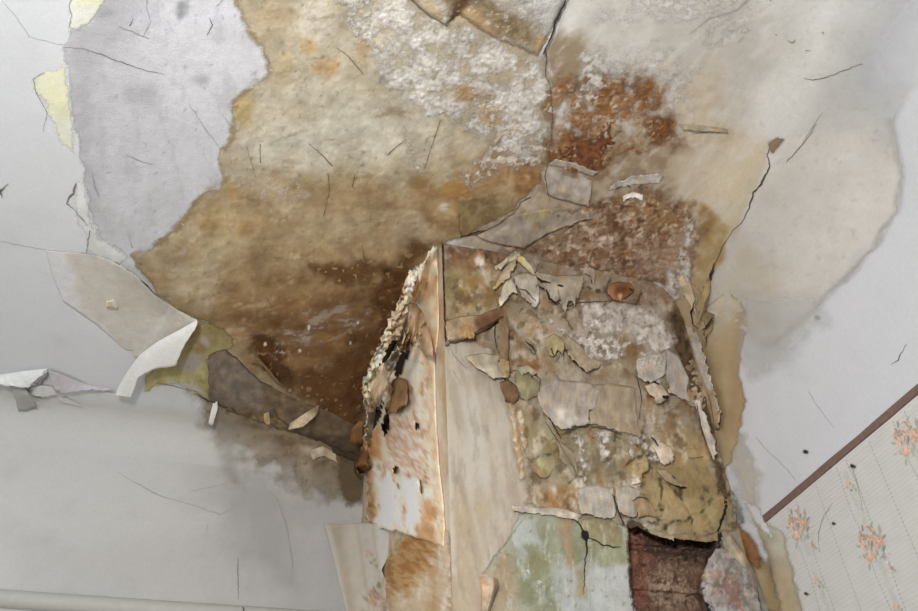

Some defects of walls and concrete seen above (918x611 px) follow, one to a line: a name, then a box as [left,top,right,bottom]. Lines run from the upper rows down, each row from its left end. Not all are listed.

crack [543,0,566,153]
corrosion [542,45,682,174]
peeling [0,0,269,411]
water stain [130,0,902,536]
peeling [459,159,641,313]
peeling [608,174,664,202]
flaking render [354,241,446,547]
peeling [478,273,722,611]
crack [574,496,625,595]